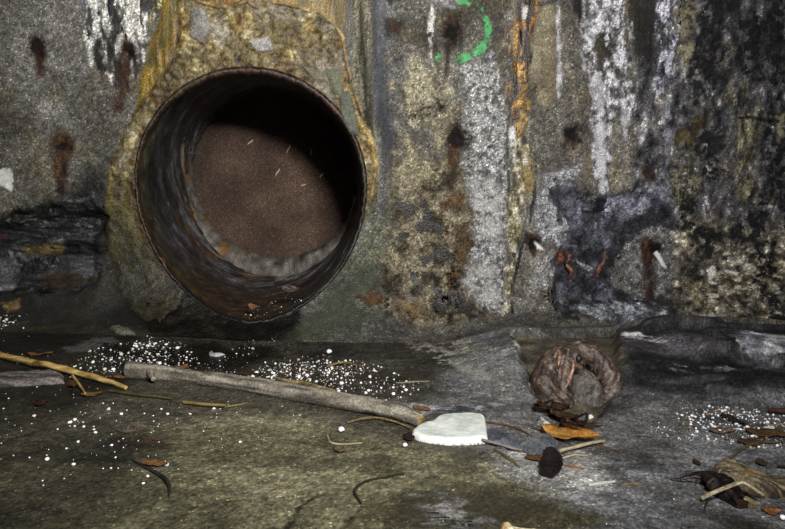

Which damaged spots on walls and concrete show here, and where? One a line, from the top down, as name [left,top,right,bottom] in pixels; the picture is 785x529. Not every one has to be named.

rust [114,0,179,111]
leakage [472,0,504,66]
rust [508,0,563,140]
leakage [554,0,564,98]
spalling [0,0,379,322]
rust [135,66,367,324]
leakage [345,0,486,329]
rust [447,122,473,190]
spalling [529,162,679,325]
rust [641,237,666,300]
leakage [574,0,785,291]
leakage [769,300,785,321]